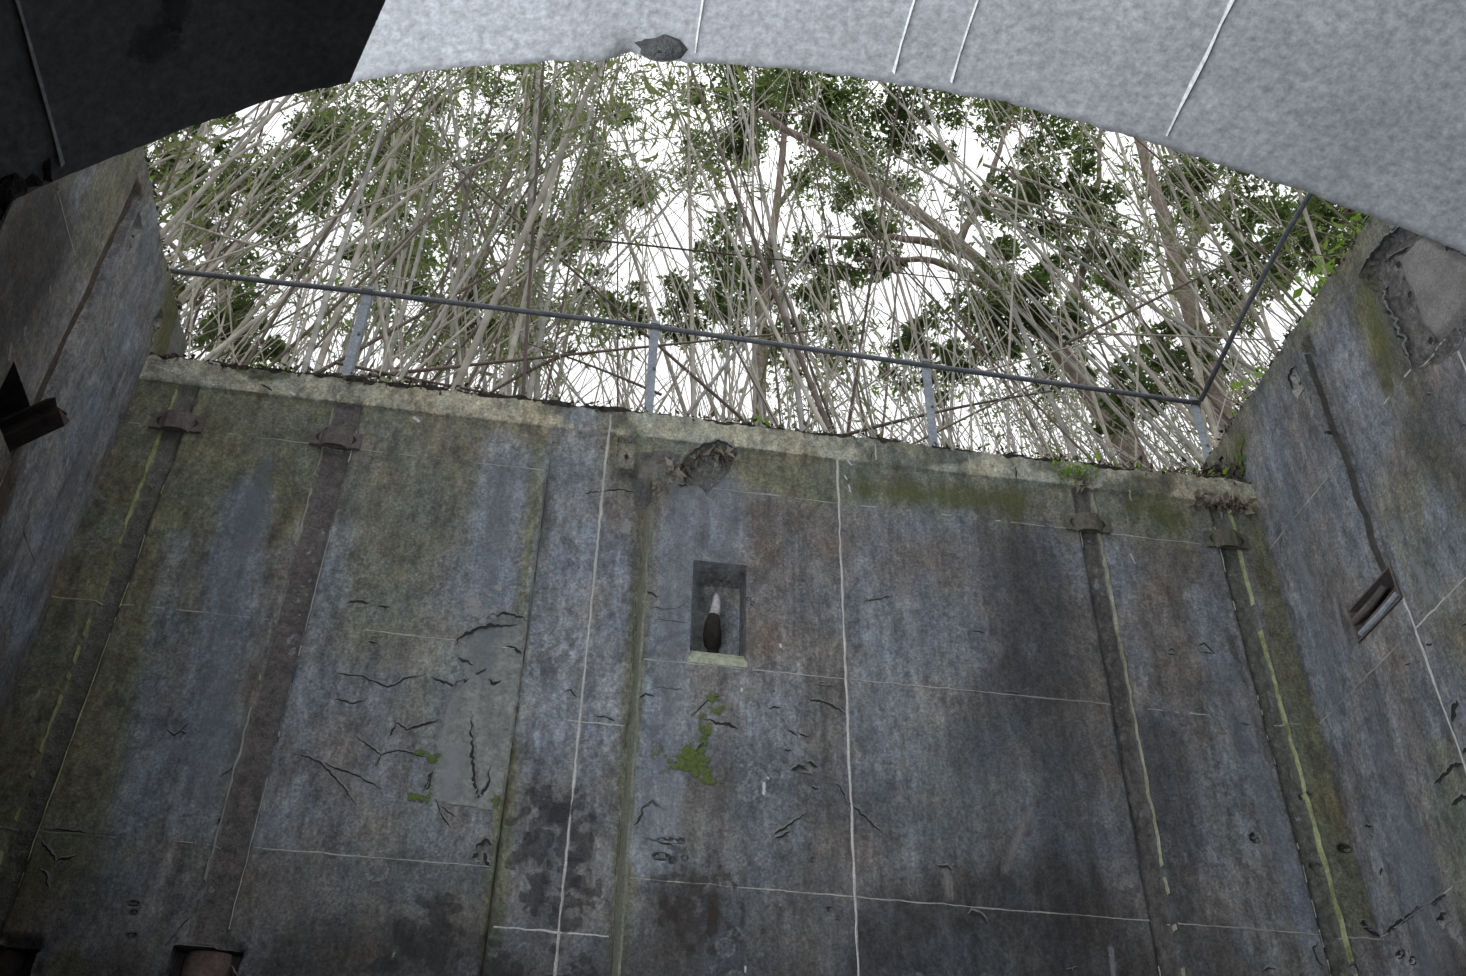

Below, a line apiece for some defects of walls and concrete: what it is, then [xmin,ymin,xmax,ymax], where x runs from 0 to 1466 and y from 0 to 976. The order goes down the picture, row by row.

spalling [1358,226,1466,371]
spalling [640,438,738,492]
crack [296,599,473,828]
crack [564,685,739,764]
crack [769,681,846,752]
crack [634,798,677,846]
crack [771,812,806,839]
crack [834,783,884,834]